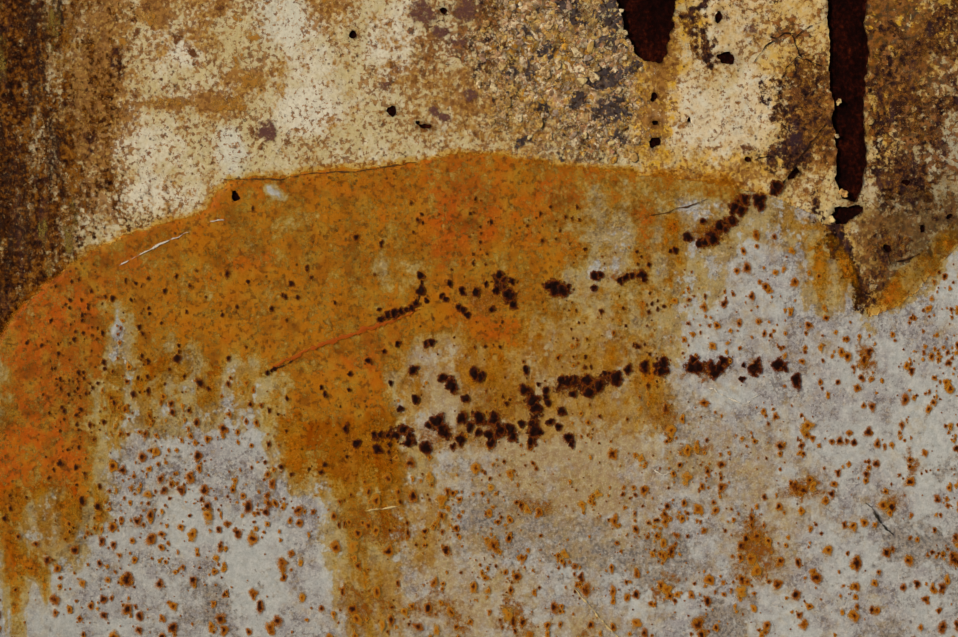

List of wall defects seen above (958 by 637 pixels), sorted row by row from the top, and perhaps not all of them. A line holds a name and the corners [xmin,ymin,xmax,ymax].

rust [807,0,958,314]
rust [738,256,808,392]
rust [818,330,884,412]
rust [890,263,958,453]
rust [231,416,260,452]
rust [755,402,784,431]
rust [791,404,857,458]
rust [150,538,232,605]
rust [166,468,319,538]
rust [565,431,881,637]
rust [921,566,956,614]
rust [922,468,958,561]